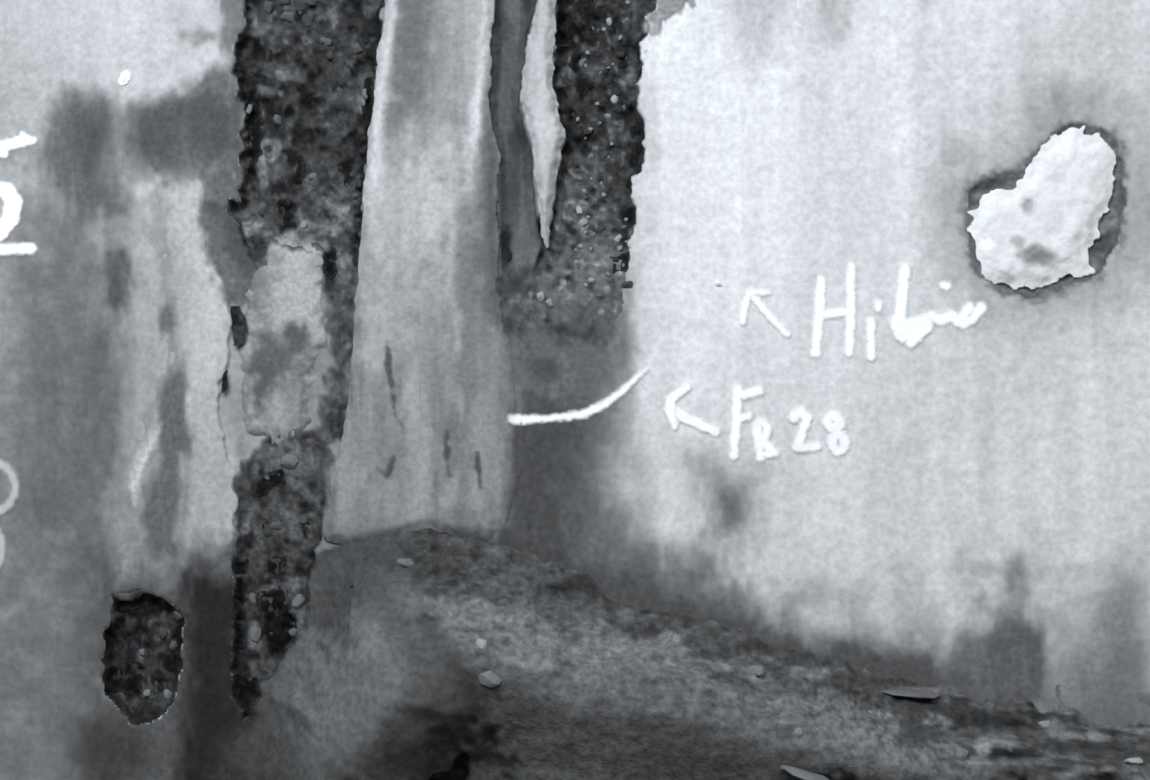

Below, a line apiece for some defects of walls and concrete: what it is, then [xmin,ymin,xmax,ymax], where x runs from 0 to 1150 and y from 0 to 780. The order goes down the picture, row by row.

leakage [46,56,244,214]
spalling [495,0,695,336]
leakage [109,252,128,308]
hole [430,753,470,780]